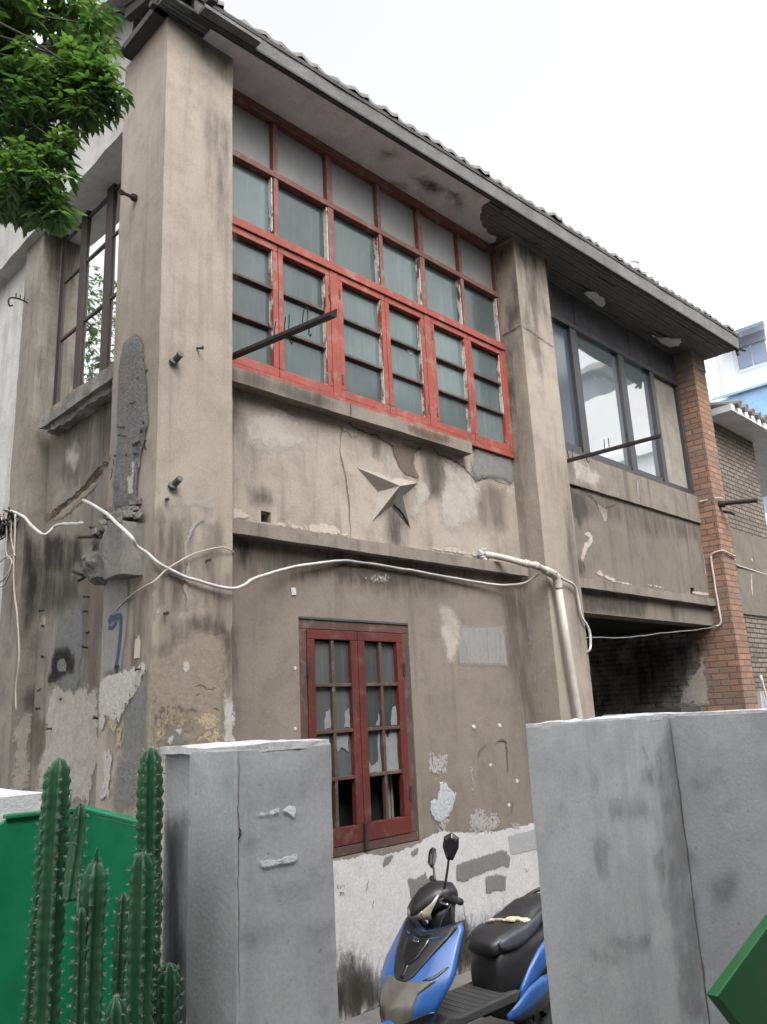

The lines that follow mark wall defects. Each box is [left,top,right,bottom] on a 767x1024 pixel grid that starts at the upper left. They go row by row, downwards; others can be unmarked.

peeling [52,482,97,521]
crack [340,405,400,537]
crack [430,446,508,485]
peeling [581,532,593,562]
peeling [9,635,147,806]
peeling [156,681,236,744]
peeling [430,769,457,831]
peeling [469,809,520,833]
damp [457,926,471,974]
damp [337,954,381,1017]